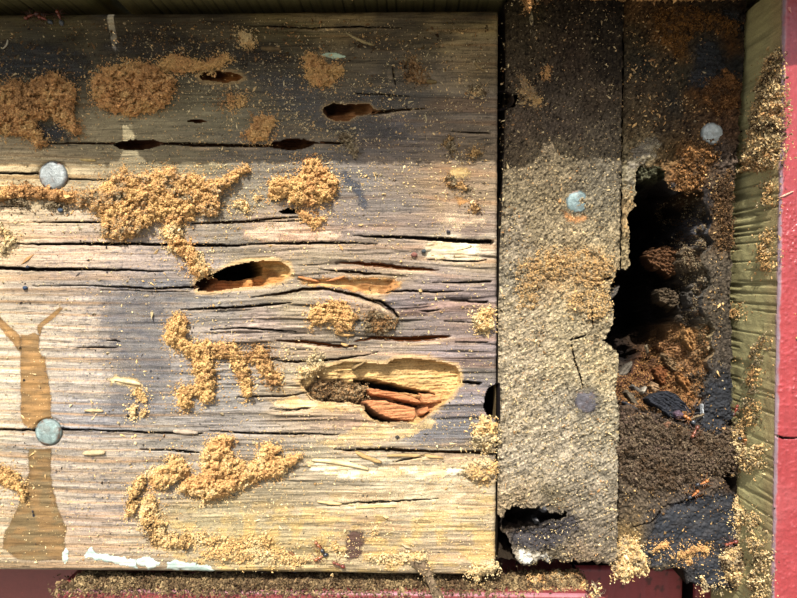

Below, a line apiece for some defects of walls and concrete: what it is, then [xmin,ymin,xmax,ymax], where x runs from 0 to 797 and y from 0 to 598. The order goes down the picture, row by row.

crack [37,218,99,226]
crack [191,216,302,224]
crack [0,235,492,363]
crack [570,277,610,387]